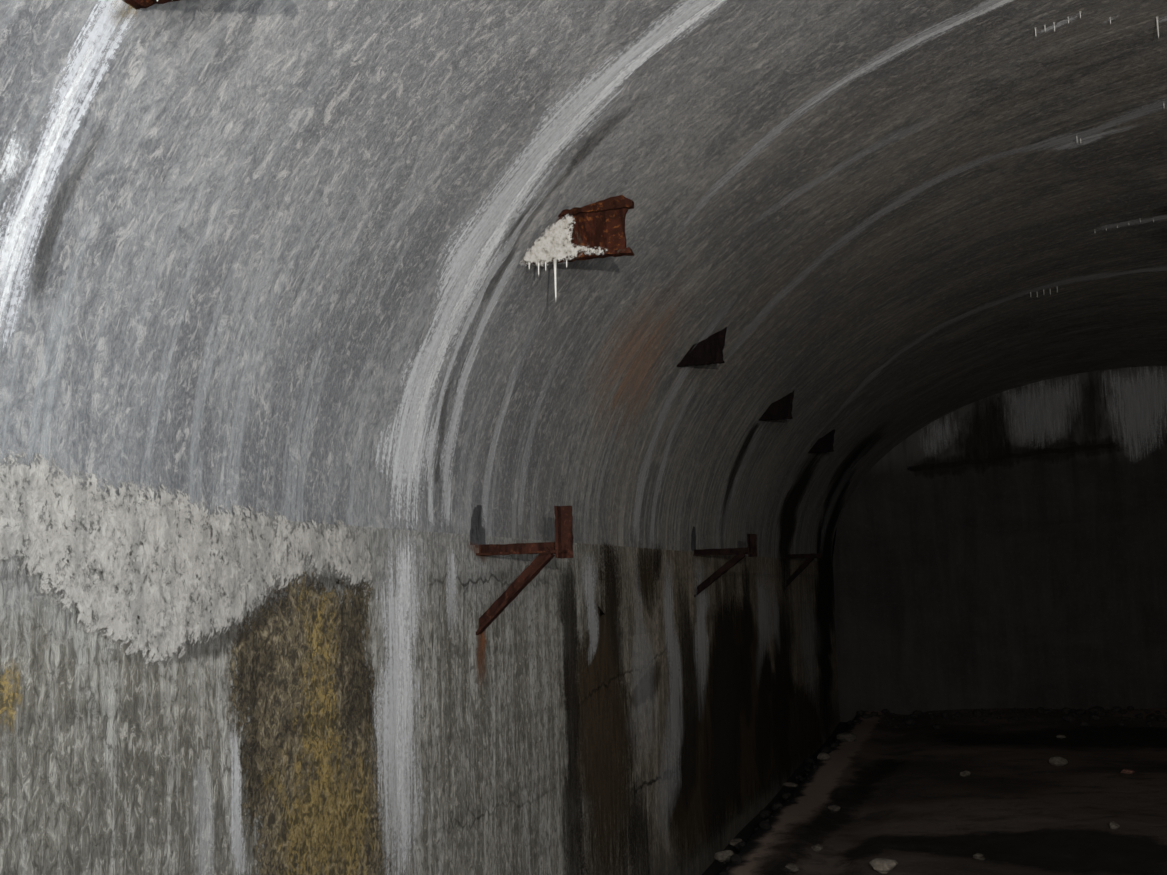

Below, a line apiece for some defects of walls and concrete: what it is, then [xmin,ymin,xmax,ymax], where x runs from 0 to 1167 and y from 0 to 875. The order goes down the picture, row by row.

damp [802,0,1014,109]
damp [1035,11,1081,36]
damp [1055,121,1115,150]
damp [374,0,726,795]
damp [636,424,886,869]
damp [558,545,659,875]
damp [232,770,241,804]